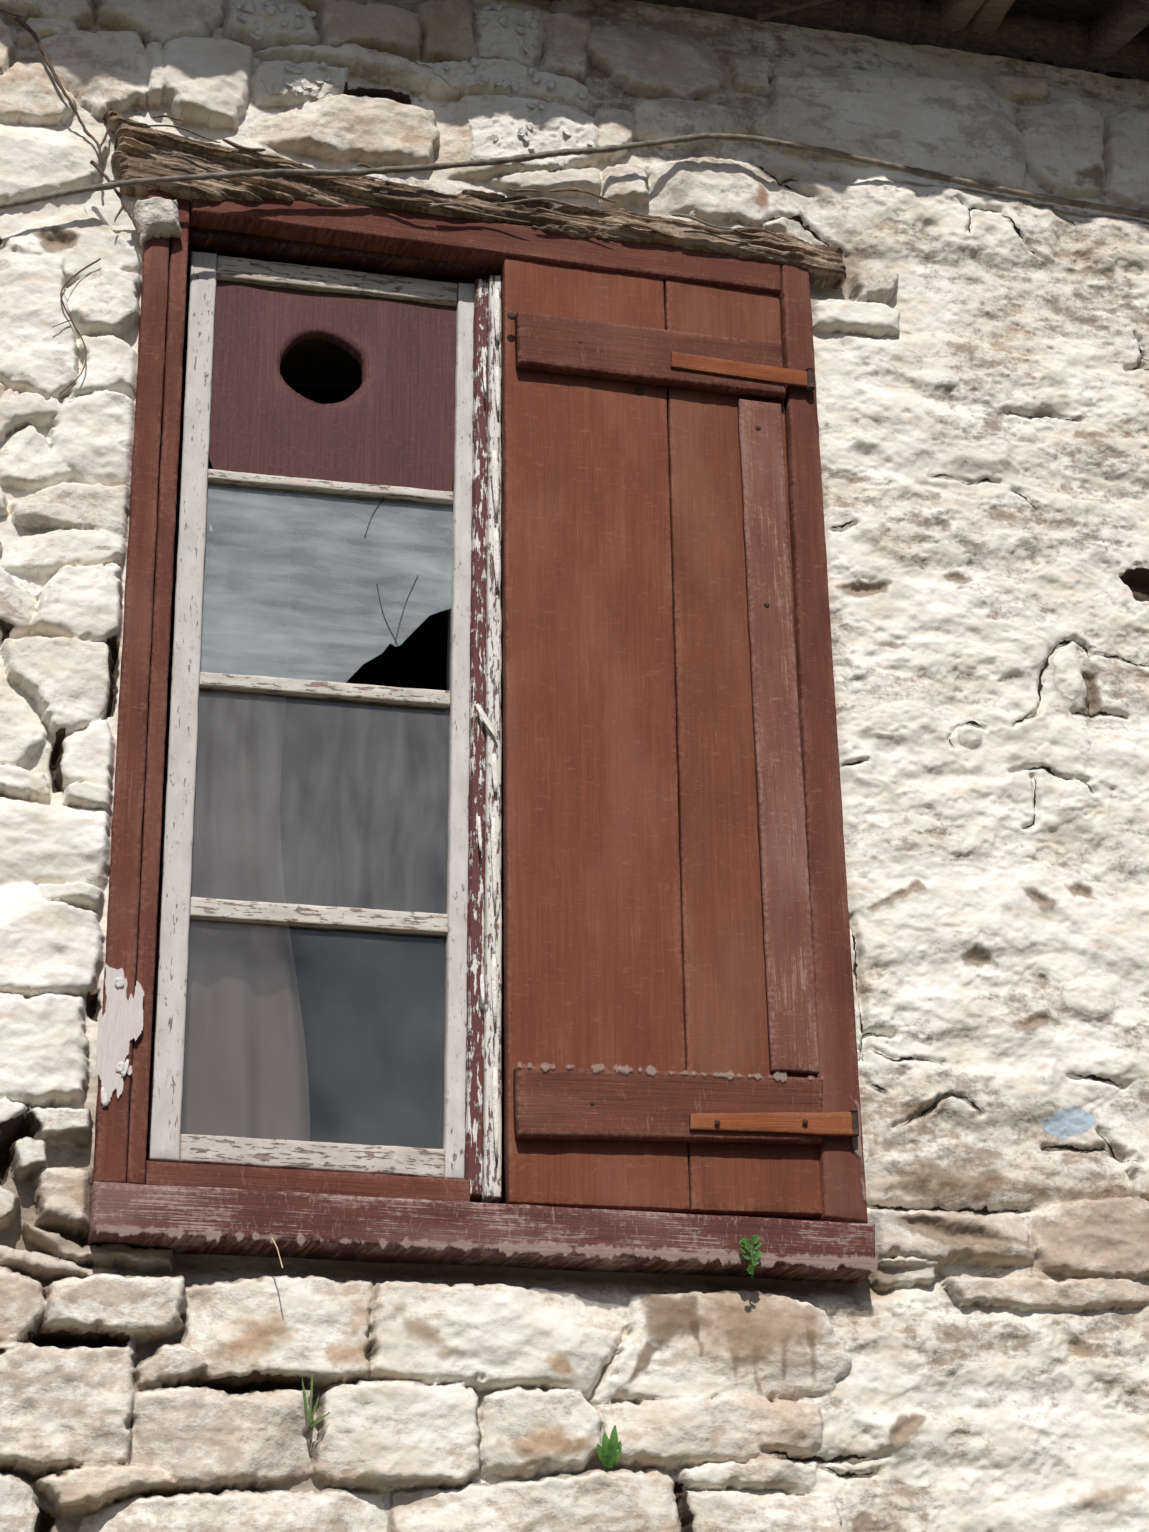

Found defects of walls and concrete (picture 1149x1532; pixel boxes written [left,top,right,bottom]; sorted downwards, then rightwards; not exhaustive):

crack [757,166,844,256]
peeling [483,365,500,412]
peeling [492,450,500,587]
crack [949,640,1149,747]
peeling [475,703,499,792]
crack [1014,766,1093,829]
peeling [477,816,497,907]
peeling [96,964,144,1107]
peeling [480,954,497,1023]
crack [850,927,981,1127]
peeling [96,1224,277,1242]
peeling [341,1237,878,1272]